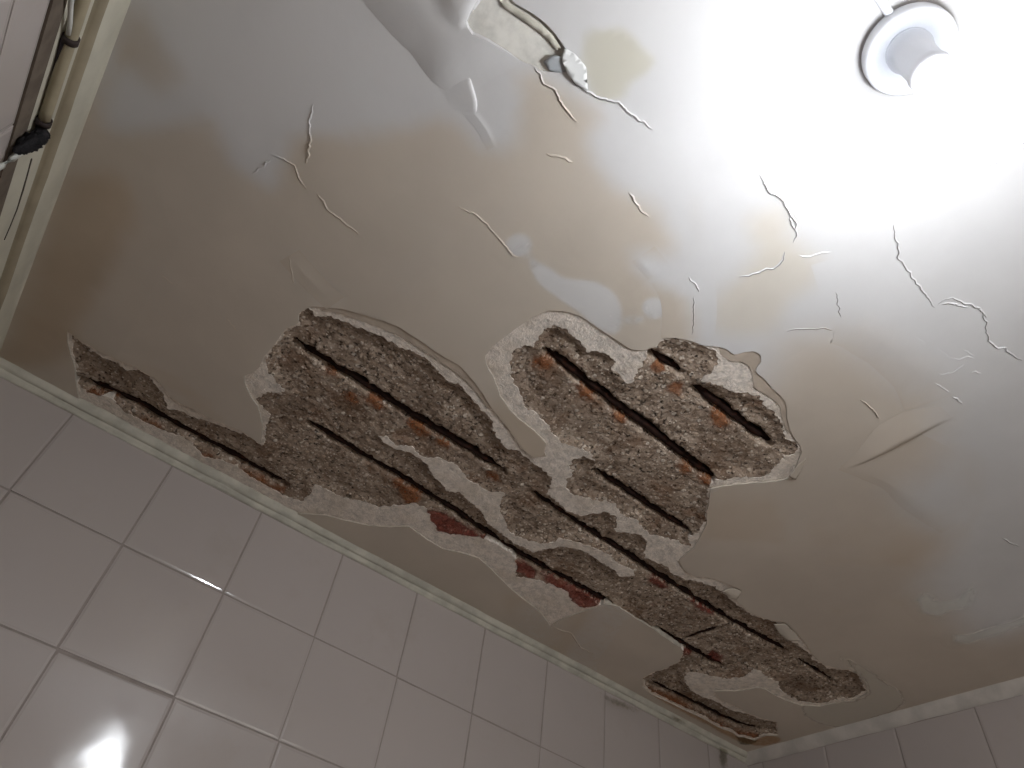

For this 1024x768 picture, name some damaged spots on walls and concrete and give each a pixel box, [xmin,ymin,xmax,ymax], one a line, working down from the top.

crack [534,67,653,130]
crack [253,103,359,235]
crack [458,207,521,258]
crack [739,175,832,277]
crack [893,225,1022,404]
rust [428,510,478,537]
spalling [68,307,867,739]
rust [515,560,601,608]